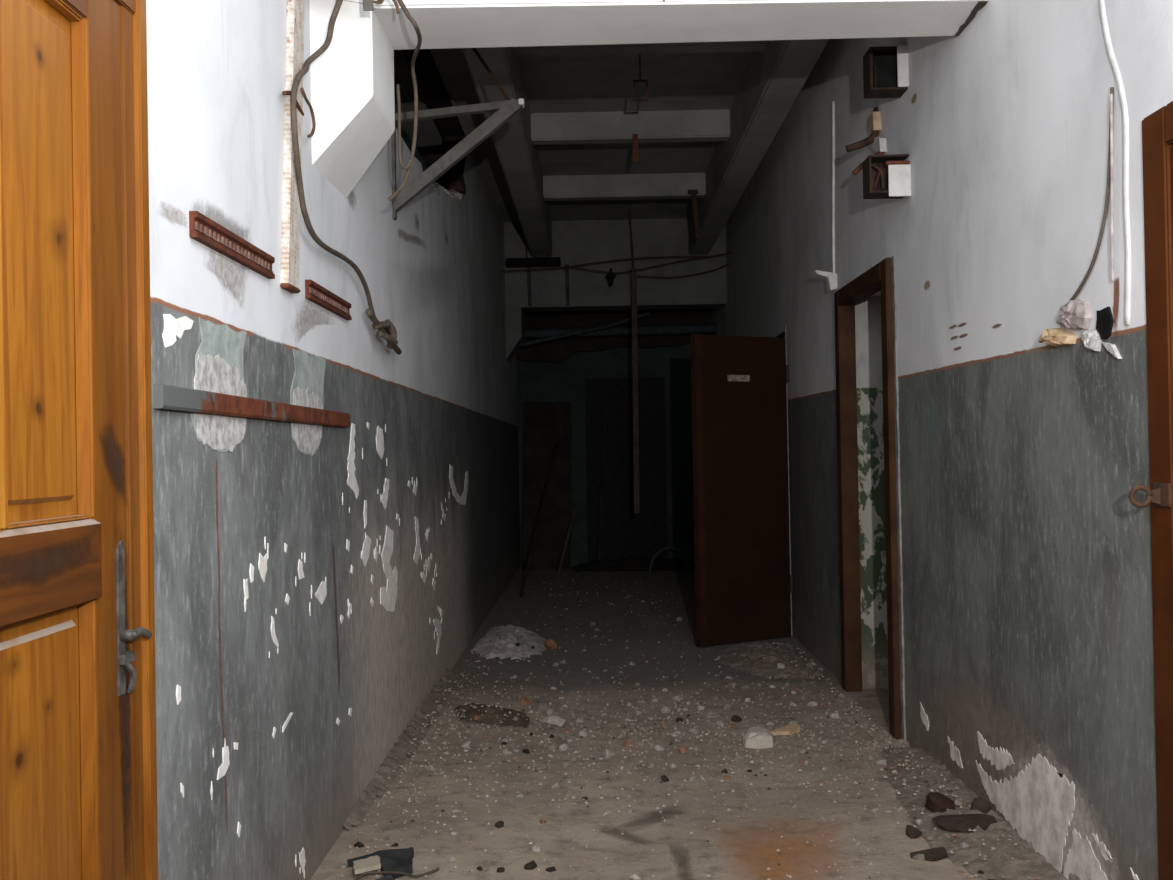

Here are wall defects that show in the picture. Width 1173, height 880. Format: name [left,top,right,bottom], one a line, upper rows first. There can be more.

damp [202,208,244,239]
peeling [162,314,247,397]
peeling [291,306,329,409]
peeling [191,412,246,452]
peeling [291,422,322,456]
peeling [342,422,400,612]
peeling [243,536,269,612]
peeling [269,552,327,658]
peeling [920,702,929,731]
peeling [210,741,238,800]
peeling [947,731,1117,880]
peeling [295,847,306,879]